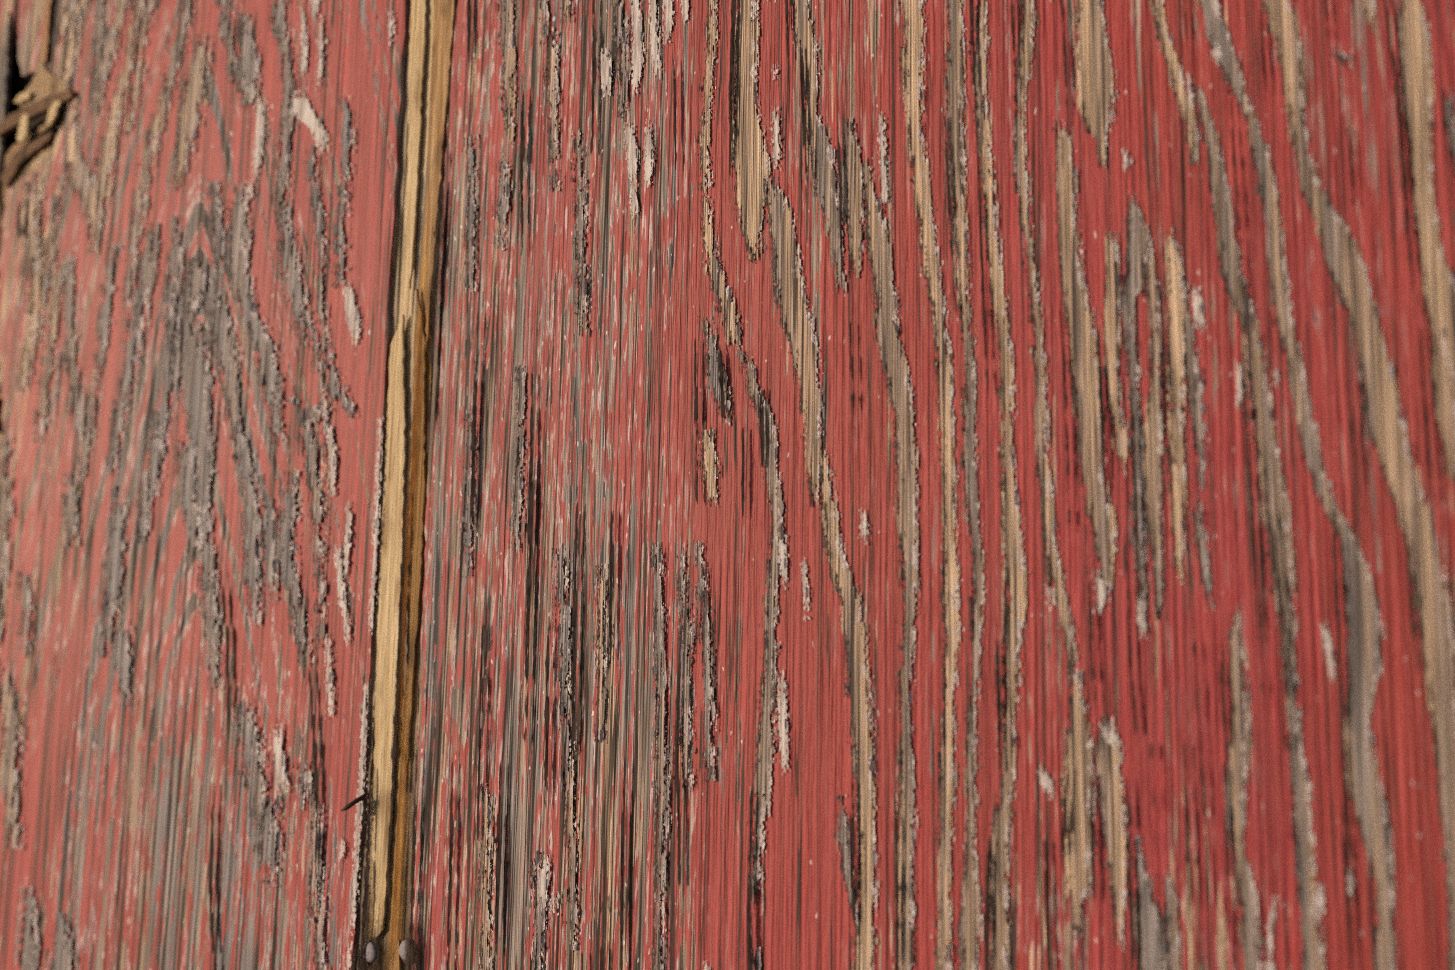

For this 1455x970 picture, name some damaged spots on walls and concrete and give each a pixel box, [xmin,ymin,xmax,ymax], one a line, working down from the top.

peeling [387,7,395,46]
peeling [461,0,520,292]
peeling [538,0,593,336]
peeling [3,0,384,719]
peeling [460,409,479,577]
peeling [506,365,529,552]
peeling [1262,0,1455,970]
peeling [0,433,37,850]
peeling [15,886,79,970]
peeling [231,683,369,970]
peeling [474,783,496,970]
peeling [528,543,610,970]